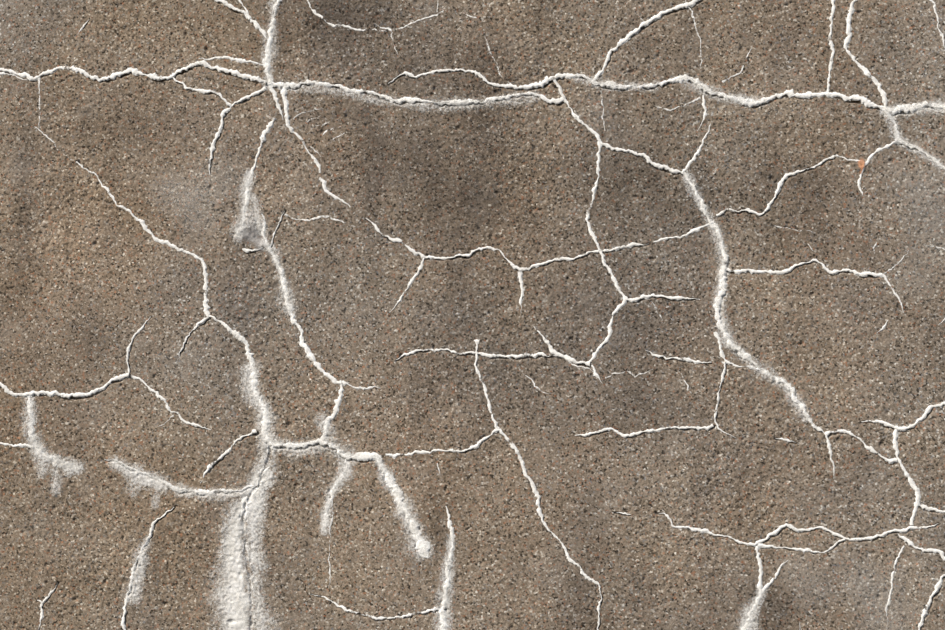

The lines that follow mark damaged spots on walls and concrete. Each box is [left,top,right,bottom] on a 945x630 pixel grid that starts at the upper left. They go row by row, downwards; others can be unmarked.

crack [0,0,945,219]
leakage [233,170,294,314]
efflorescence [24,397,83,493]
crack [0,316,211,467]
leakage [110,362,354,630]
crack [76,161,430,558]
crack [312,506,455,630]
efflorescence [375,458,430,558]
leakage [435,535,455,630]
crack [386,212,695,630]
efflorescence [740,589,763,630]
crack [575,220,945,630]